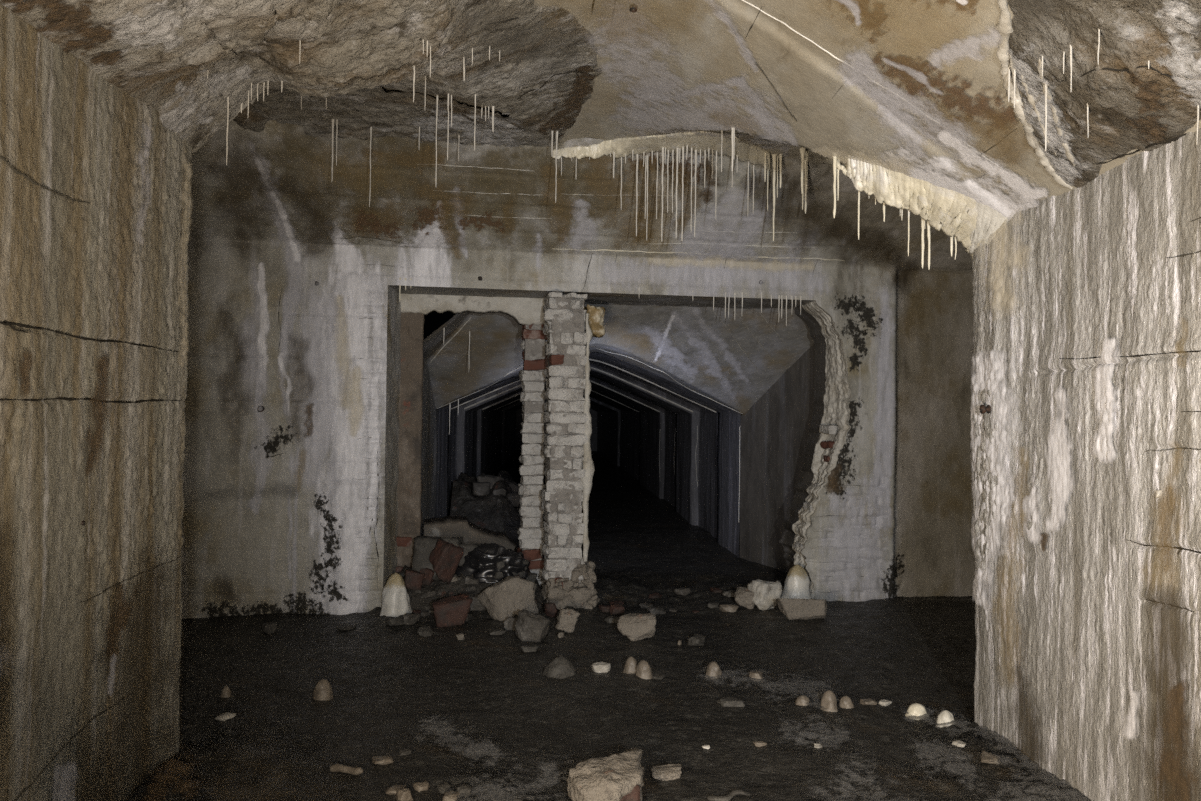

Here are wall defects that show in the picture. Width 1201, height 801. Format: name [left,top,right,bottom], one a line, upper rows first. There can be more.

crack [0,156,90,204]
leakage [805,31,1048,307]
leakage [179,165,192,366]
leakage [201,0,914,618]
crack [0,321,180,352]
crack [1062,350,1201,359]
crack [0,396,182,404]